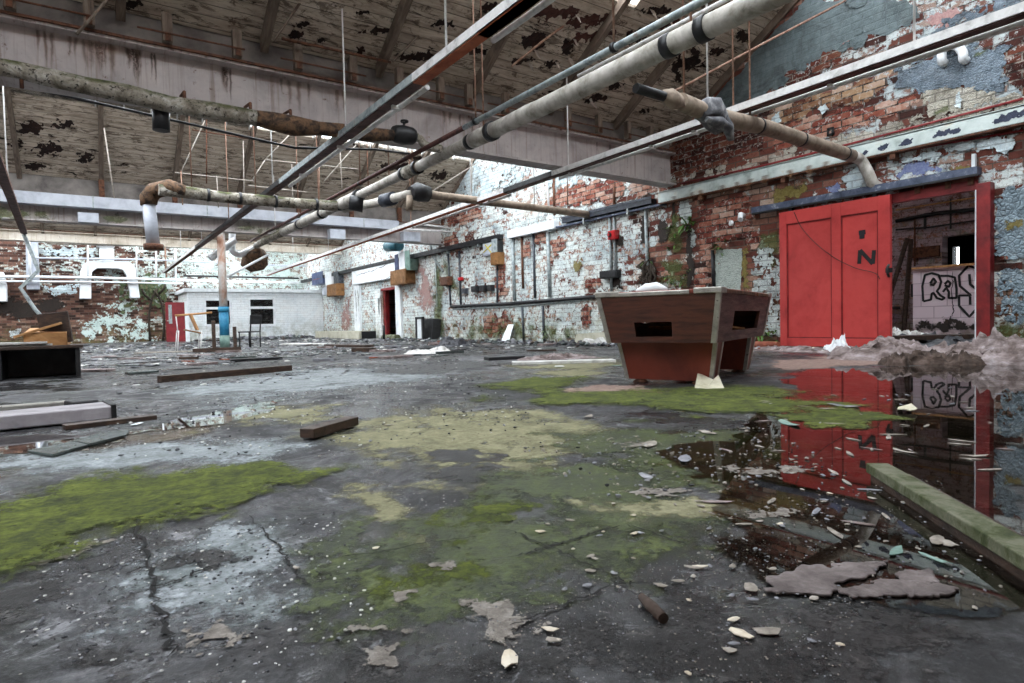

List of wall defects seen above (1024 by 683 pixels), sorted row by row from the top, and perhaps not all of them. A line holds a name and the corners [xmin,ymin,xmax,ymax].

peeling [511,4,681,71]
peeling [669,0,1021,108]
peeling [7,118,82,172]
peeling [753,39,1024,163]
peeling [428,163,524,256]
spalling [511,175,656,267]
peeling [80,301,157,343]
damp [0,345,622,556]
crack [81,518,216,657]
damp [112,517,312,656]
crack [232,515,311,585]
spalling [744,535,960,600]